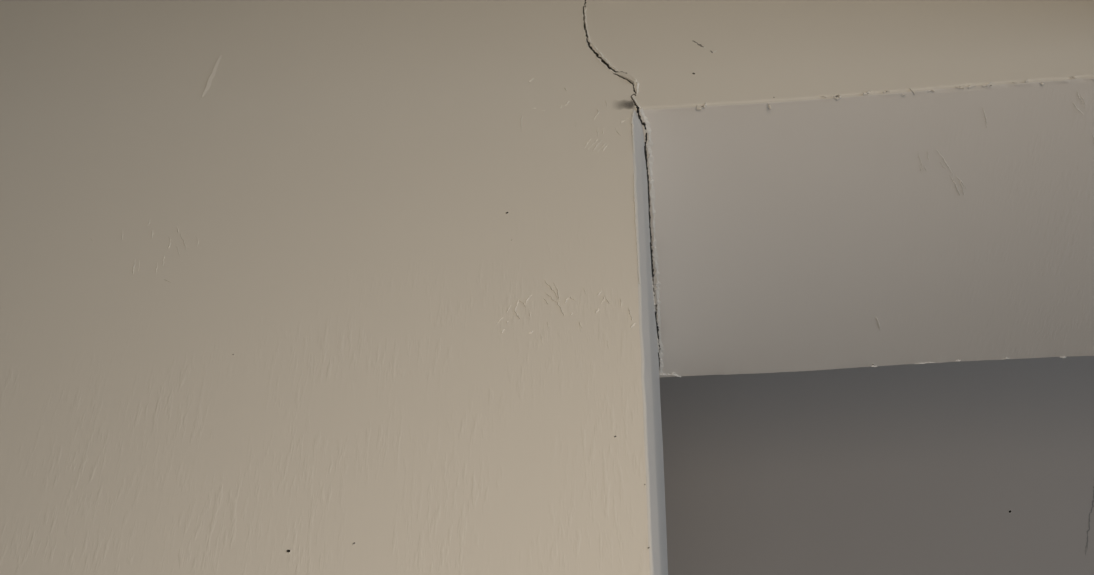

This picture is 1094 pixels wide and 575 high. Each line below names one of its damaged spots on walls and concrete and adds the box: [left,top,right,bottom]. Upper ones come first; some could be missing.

crack [582,0,664,374]